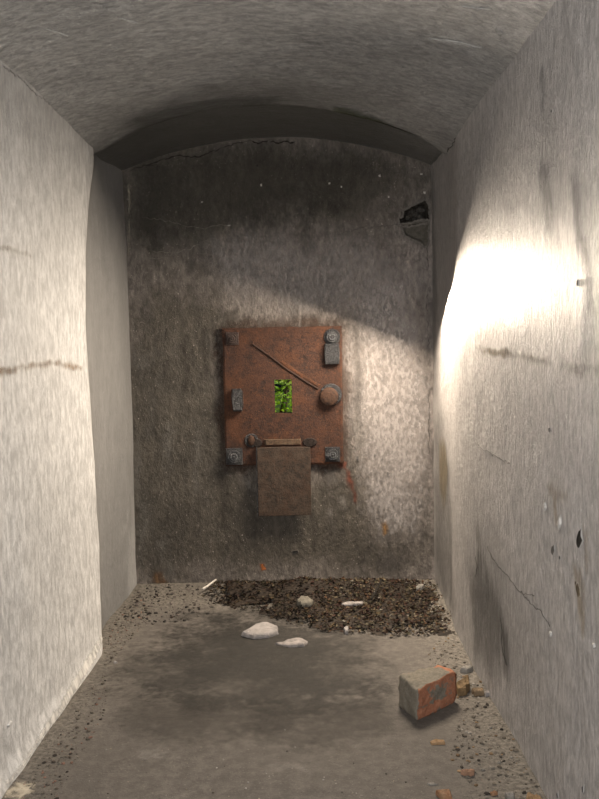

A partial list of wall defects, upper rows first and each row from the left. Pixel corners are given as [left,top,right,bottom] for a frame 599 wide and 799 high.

flaking render [397,191,431,248]
corrosion [216,317,355,501]
peeling [576,528,584,549]
crack [475,547,550,627]